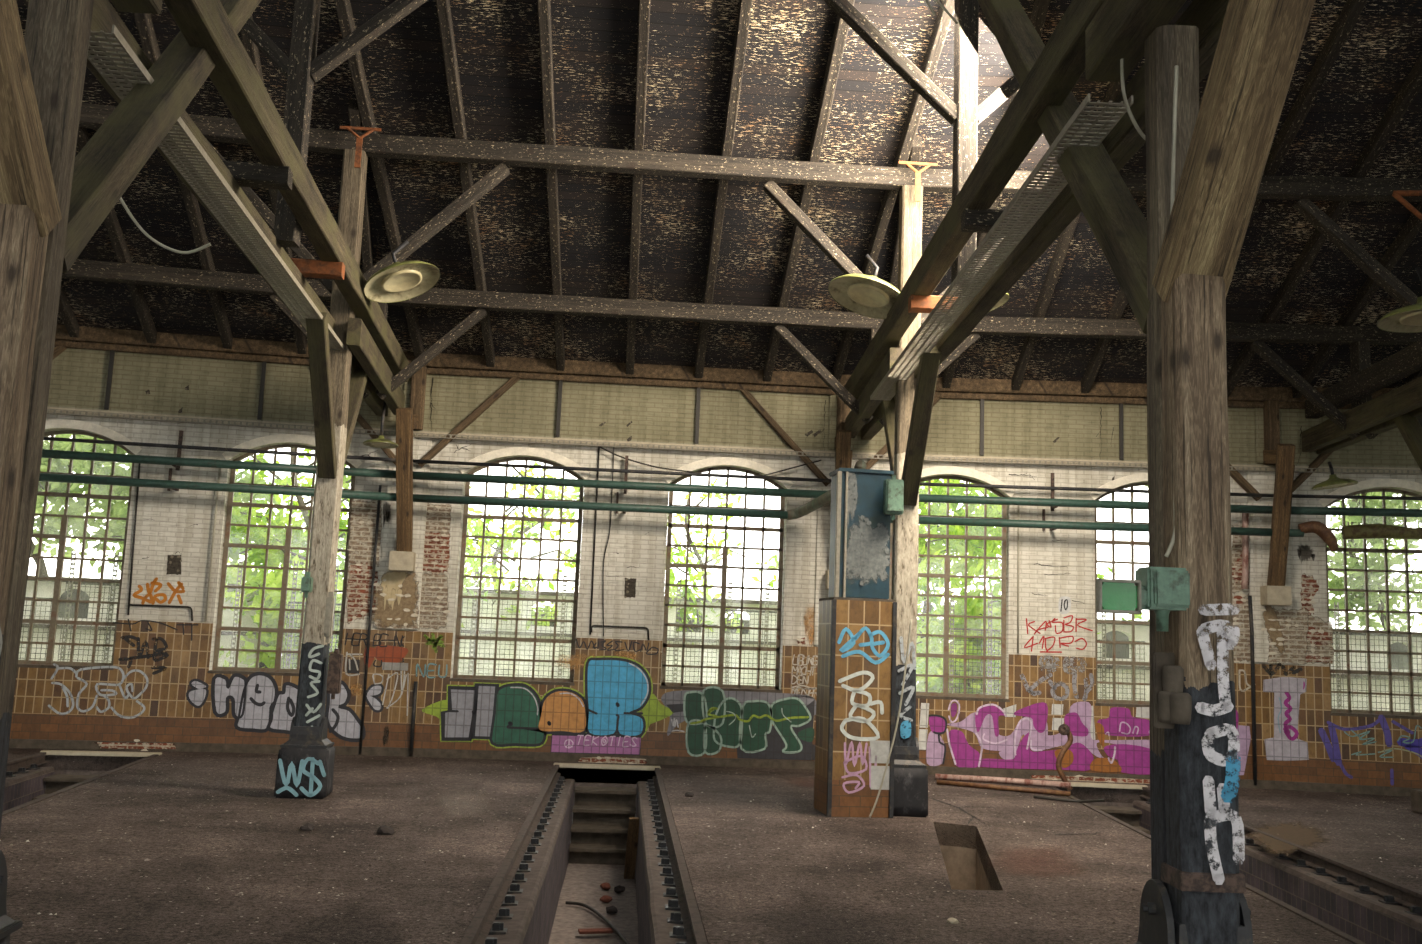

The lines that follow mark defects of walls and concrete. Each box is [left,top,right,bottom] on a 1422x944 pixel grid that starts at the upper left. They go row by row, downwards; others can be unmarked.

peeling [346,500,451,630]
peeling [1232,524,1334,665]